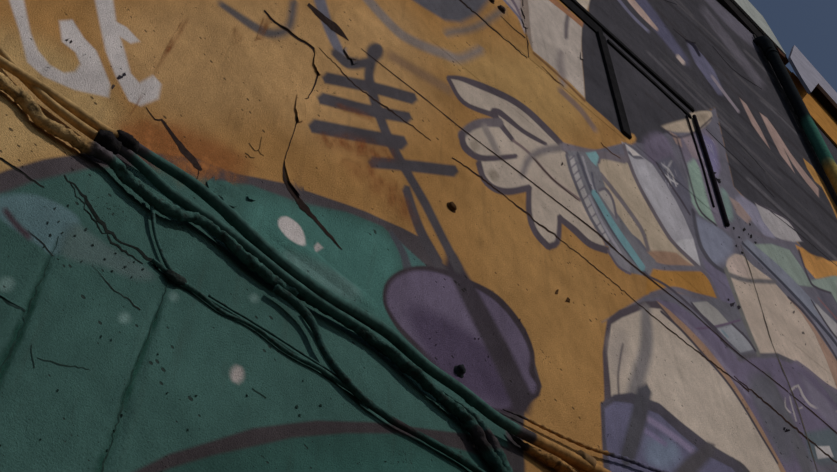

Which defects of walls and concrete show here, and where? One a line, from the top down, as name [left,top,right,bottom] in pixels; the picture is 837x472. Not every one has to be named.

crack [0,155,45,187]
crack [0,229,86,373]
crack [64,175,169,472]
crack [264,7,431,250]
crack [307,0,837,472]